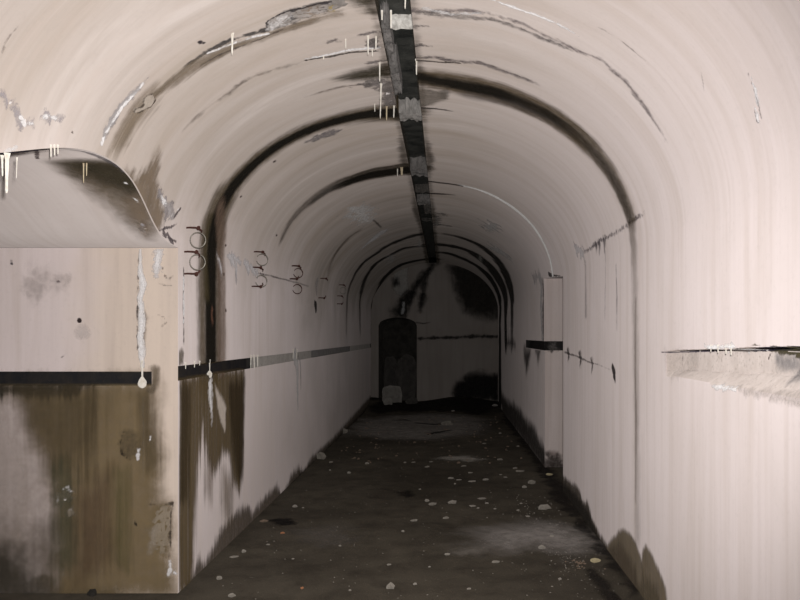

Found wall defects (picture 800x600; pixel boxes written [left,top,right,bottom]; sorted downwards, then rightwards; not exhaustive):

spalling [265,0,347,31]
crack [412,7,594,57]
crack [416,57,529,81]
peeling [0,92,33,131]
crack [612,71,651,117]
leakage [199,103,411,364]
crack [585,214,640,251]
leakage [0,249,280,593]
leakage [288,394,666,600]
spalling [150,502,174,551]